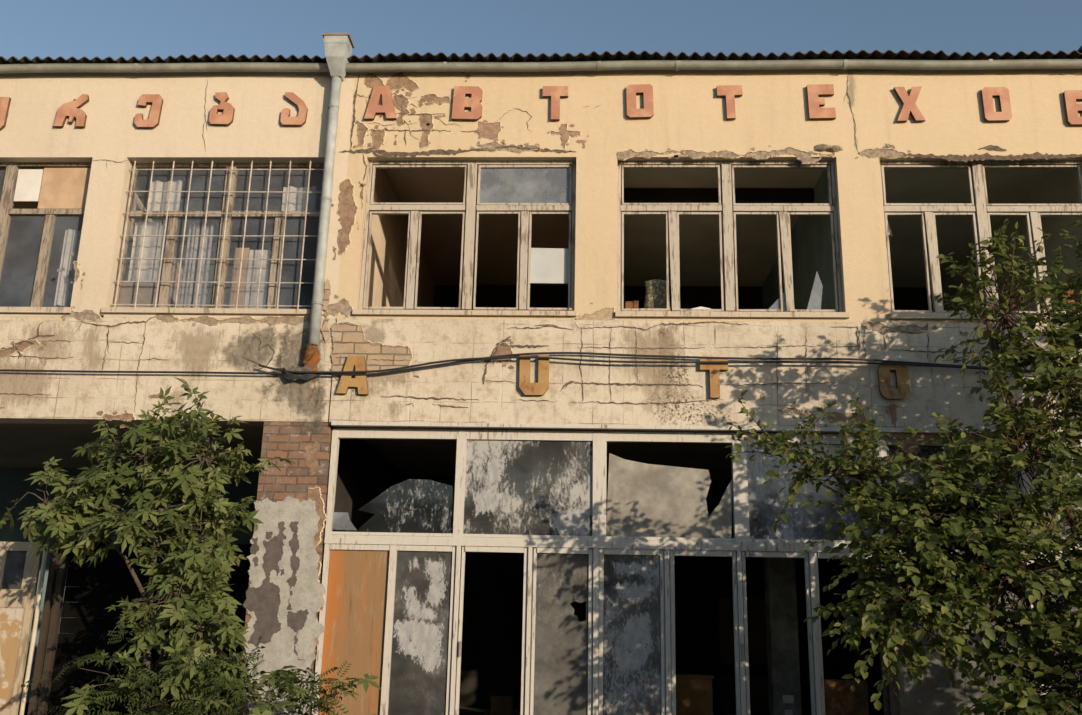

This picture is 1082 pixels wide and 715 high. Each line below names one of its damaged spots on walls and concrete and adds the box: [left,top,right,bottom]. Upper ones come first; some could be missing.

spalling [353,72,453,155]
spalling [470,120,541,154]
spalling [616,145,836,164]
spalling [855,143,914,159]
peeling [331,179,365,260]
crack [0,316,163,412]
crack [245,329,308,371]
spalling [156,279,419,382]
rust [301,349,320,389]
crack [335,323,409,361]
crack [381,321,990,408]
peeling [239,440,327,715]